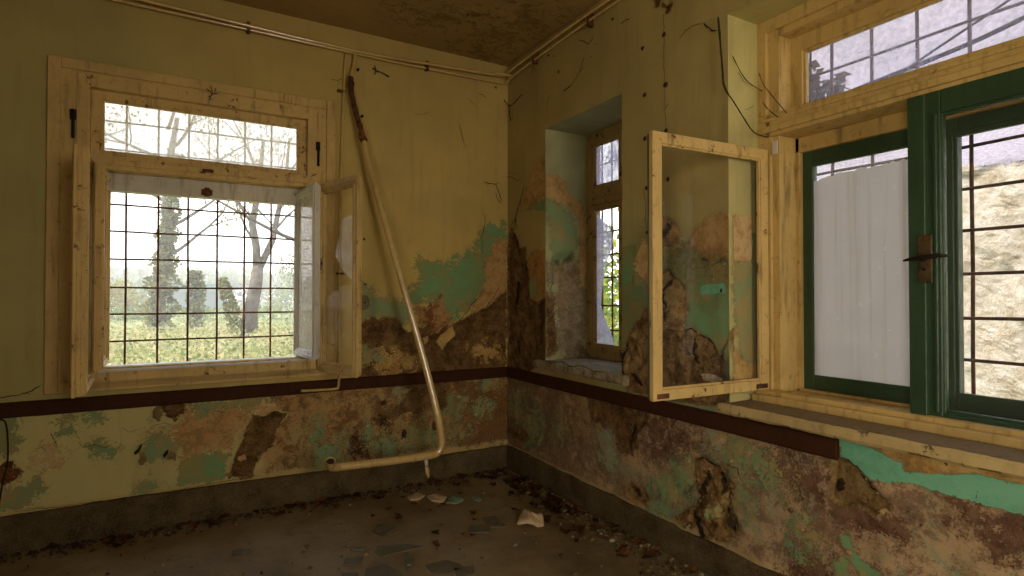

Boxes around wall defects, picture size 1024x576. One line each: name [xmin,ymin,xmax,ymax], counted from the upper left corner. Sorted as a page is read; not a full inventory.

peeling [519,156,587,290]
spalling [359,214,558,447]
spalling [621,237,648,396]
spalling [662,211,756,407]
peeling [0,417,52,512]
spalling [50,397,288,481]
spalling [587,398,656,459]
spalling [622,457,743,544]
peeling [828,439,1024,518]
peeling [833,534,881,576]